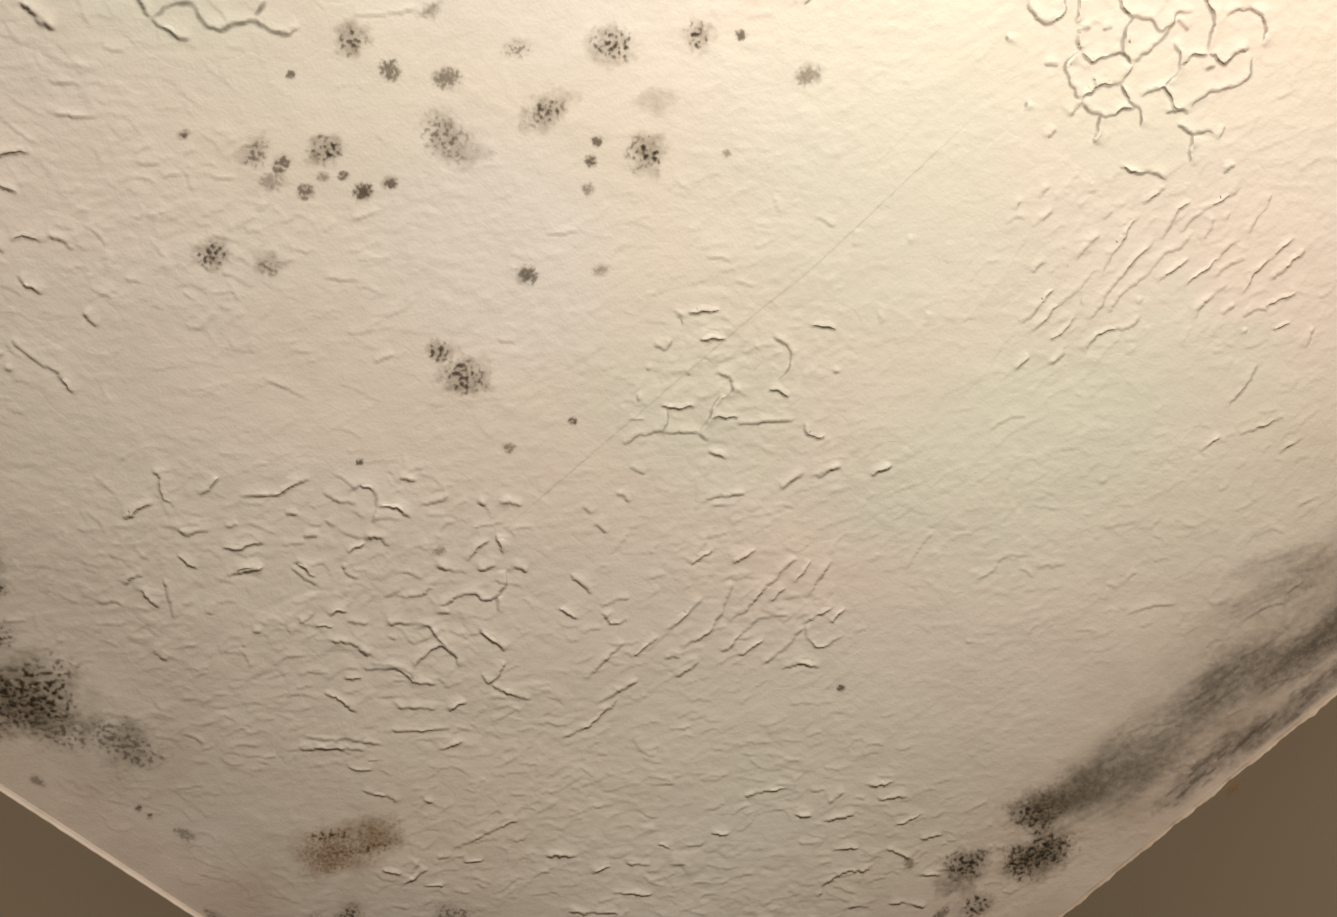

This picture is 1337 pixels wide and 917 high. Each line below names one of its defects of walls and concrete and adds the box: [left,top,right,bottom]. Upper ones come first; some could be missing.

crack [0,0,349,70]
crack [979,0,1293,196]
leakage [340,173,397,198]
peeling [0,122,126,421]
leakage [449,363,480,388]
crack [96,285,916,770]
leakage [0,662,69,742]
peeling [539,527,869,759]
leakage [1187,608,1337,714]
leakage [1007,747,1165,880]
leakage [950,854,983,880]